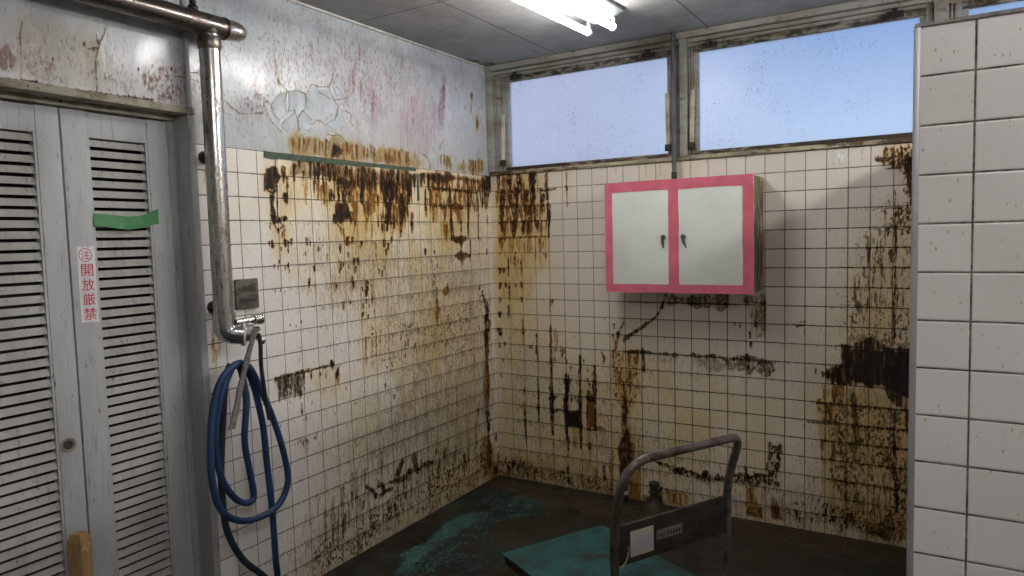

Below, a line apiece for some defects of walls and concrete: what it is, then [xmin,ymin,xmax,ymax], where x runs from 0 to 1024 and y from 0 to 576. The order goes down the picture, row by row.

peeling [271,87,344,131]
damp [274,360,339,402]
corrosion [264,139,556,474]
damp [314,426,665,573]
corrosion [522,293,687,504]
damp [625,294,776,376]
damp [654,442,782,490]
damp [713,190,911,561]